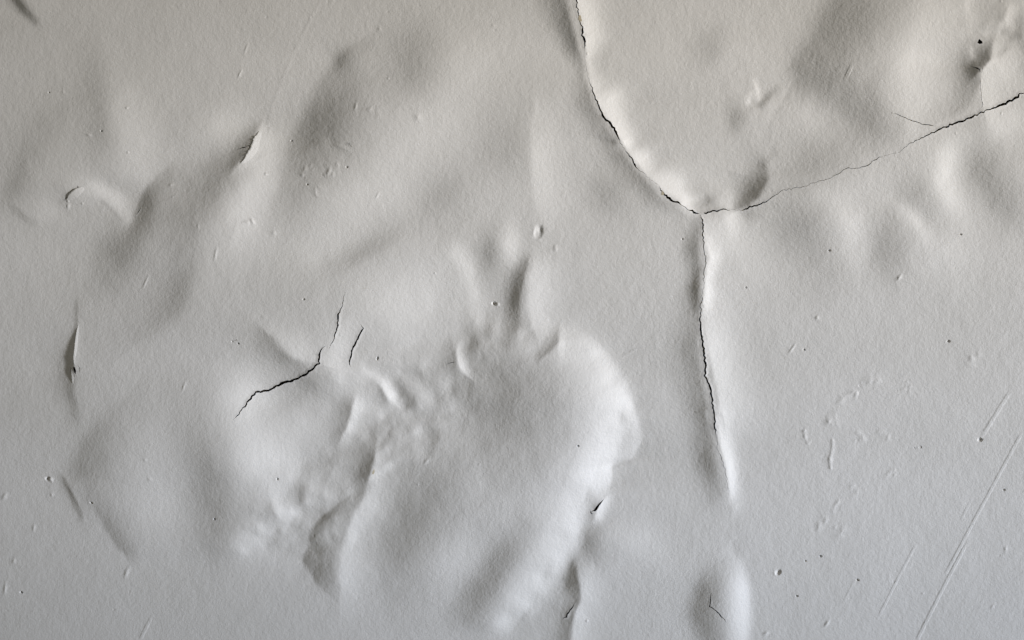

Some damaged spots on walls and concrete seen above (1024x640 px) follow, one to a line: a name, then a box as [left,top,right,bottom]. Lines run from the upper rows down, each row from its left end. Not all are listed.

crack [230,292,367,423]
crack [573,0,1024,495]